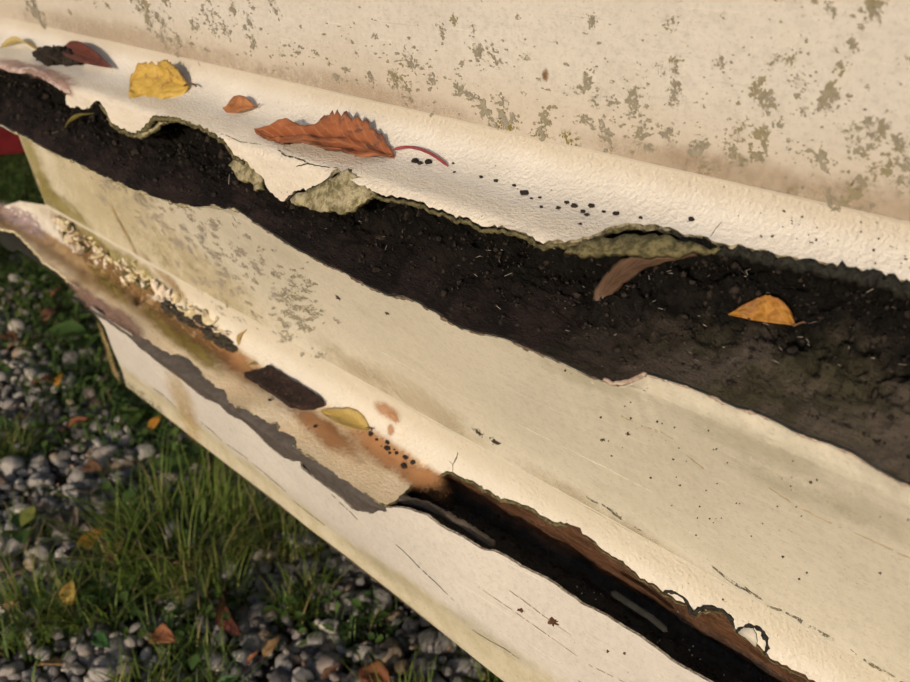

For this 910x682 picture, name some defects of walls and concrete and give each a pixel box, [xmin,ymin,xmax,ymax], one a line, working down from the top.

spalling [99,104,267,192]
peeling [130,0,535,130]
peeling [530,99,563,142]
peeling [536,0,910,233]
damp [39,177,253,381]
peeling [0,124,342,343]
spalling [290,168,910,301]
rust [377,404,398,435]
spalling [603,371,910,487]
spalling [438,471,567,528]
spalling [583,536,687,606]
spalling [695,610,814,682]